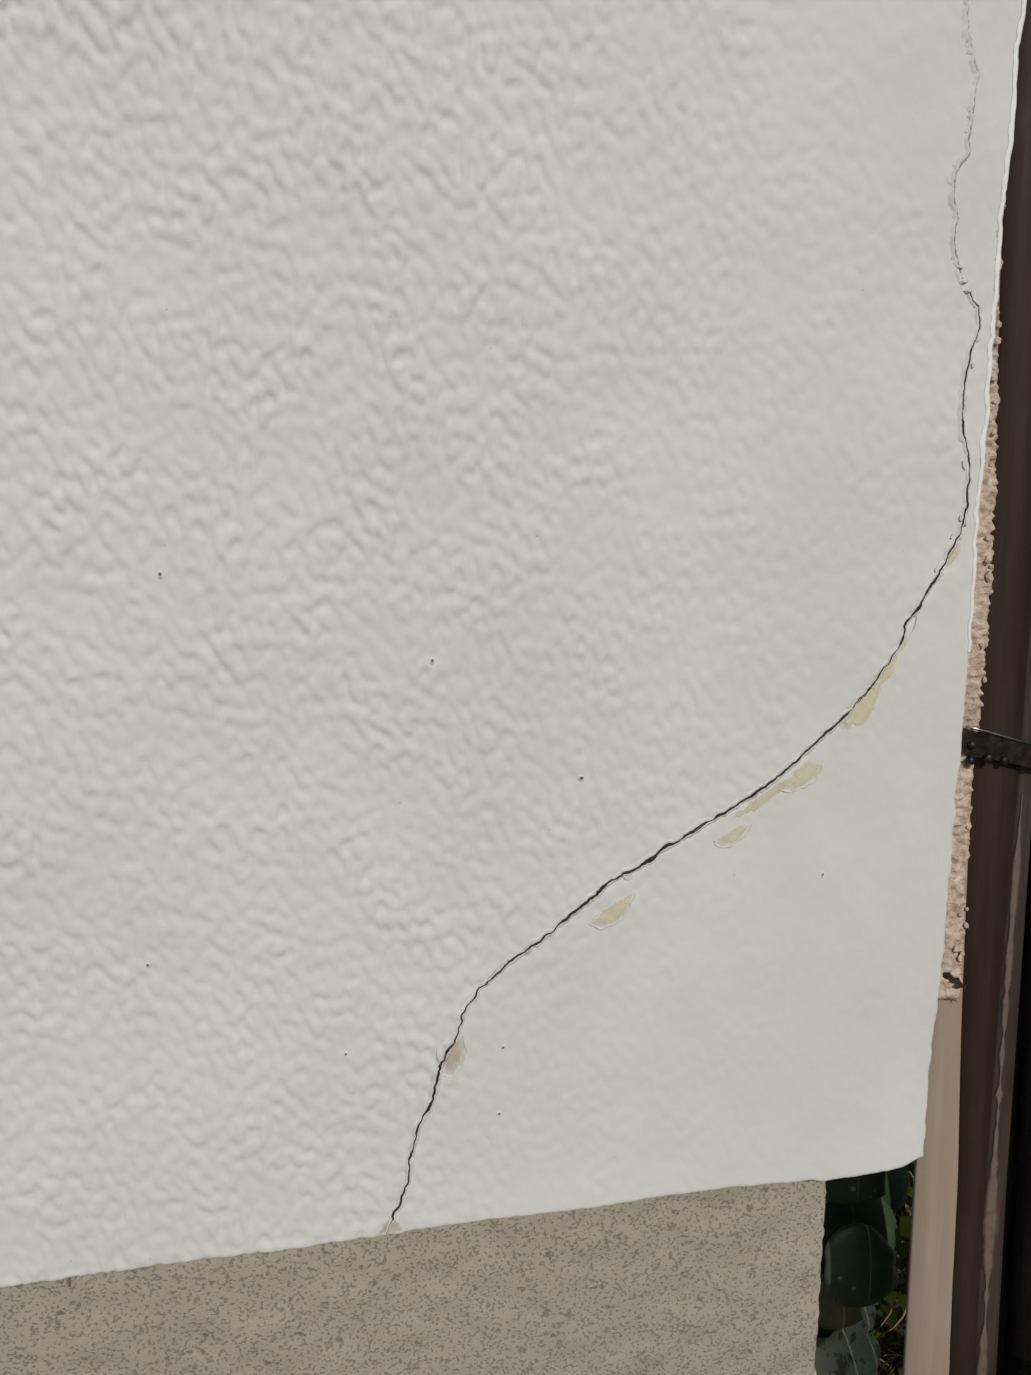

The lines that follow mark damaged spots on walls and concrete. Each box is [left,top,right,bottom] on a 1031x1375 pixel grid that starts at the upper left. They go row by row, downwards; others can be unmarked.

crack [382,0,983,1235]
peeling [714,763,825,848]